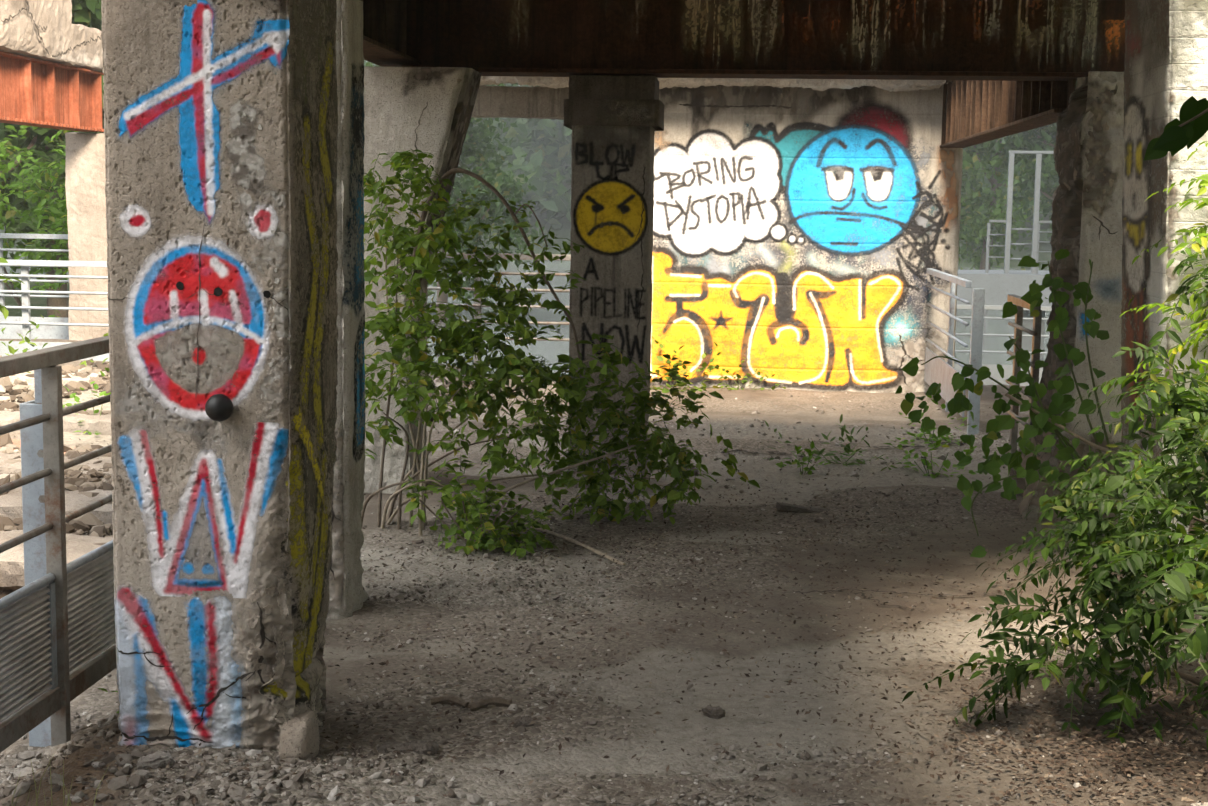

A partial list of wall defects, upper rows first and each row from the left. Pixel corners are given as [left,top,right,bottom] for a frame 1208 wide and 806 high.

crack [1,0,101,57]
rust [1105,20,1125,52]
spalling [1037,81,1118,416]
crack [116,602,276,743]